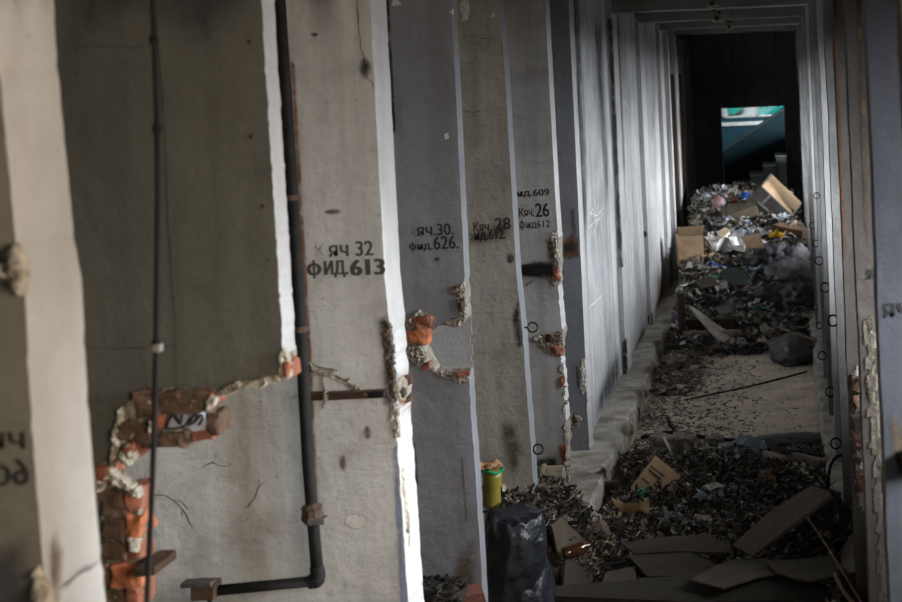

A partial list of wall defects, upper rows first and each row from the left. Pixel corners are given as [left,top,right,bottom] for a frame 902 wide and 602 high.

flaking render [549,230,562,285]
flaking render [95,345,338,602]
spalling [380,320,414,439]
flaking render [406,283,471,384]
flaking render [534,330,582,485]
peeling [577,357,588,394]
peeling [848,316,887,602]